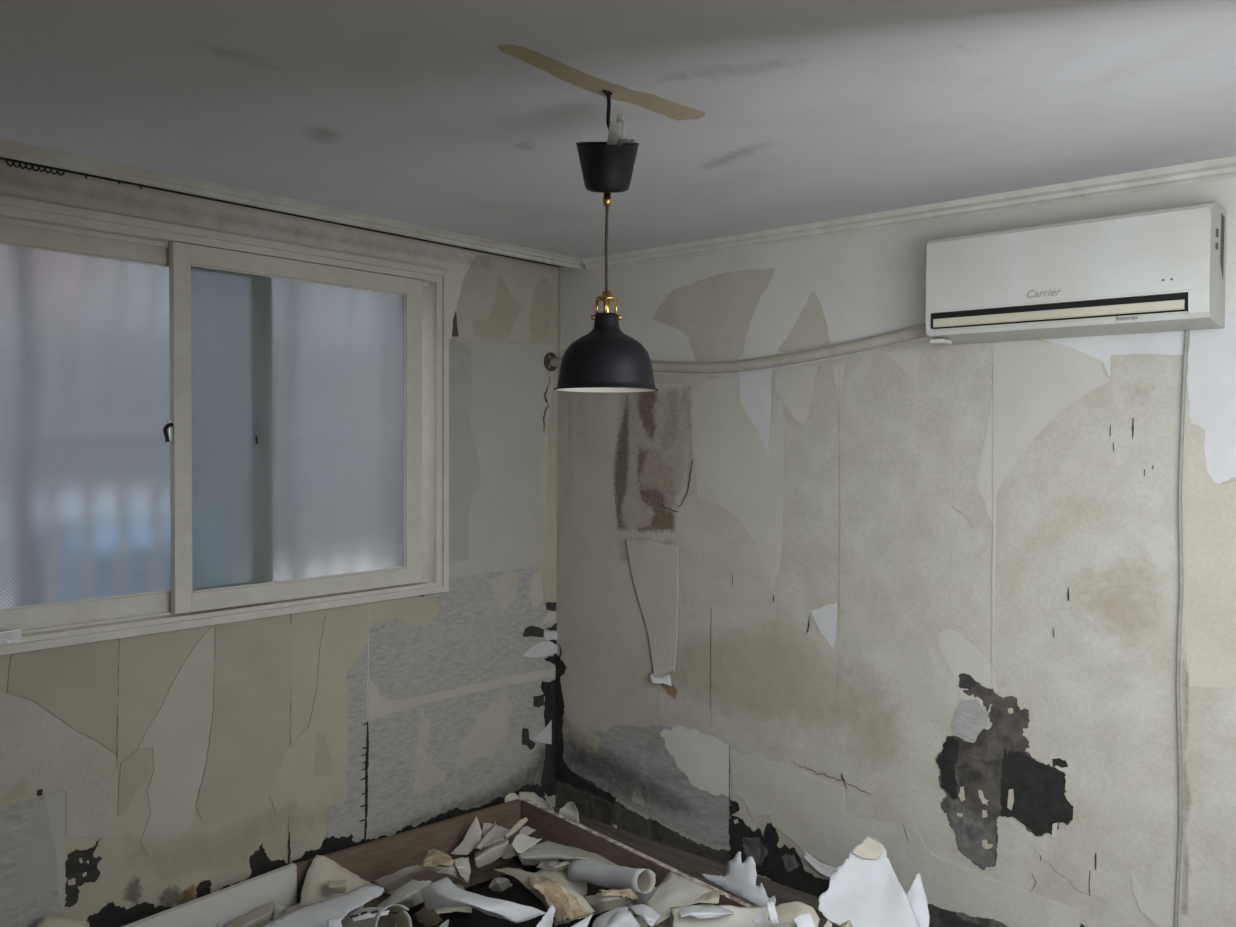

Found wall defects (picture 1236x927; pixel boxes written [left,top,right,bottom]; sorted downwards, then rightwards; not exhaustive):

damp [614,392,657,528]
damp [639,459,693,532]
peeling [196,602,837,898]
spalling [935,673,1076,870]
peeling [65,839,102,907]
peeling [87,902,173,927]
peeling [928,904,1008,927]